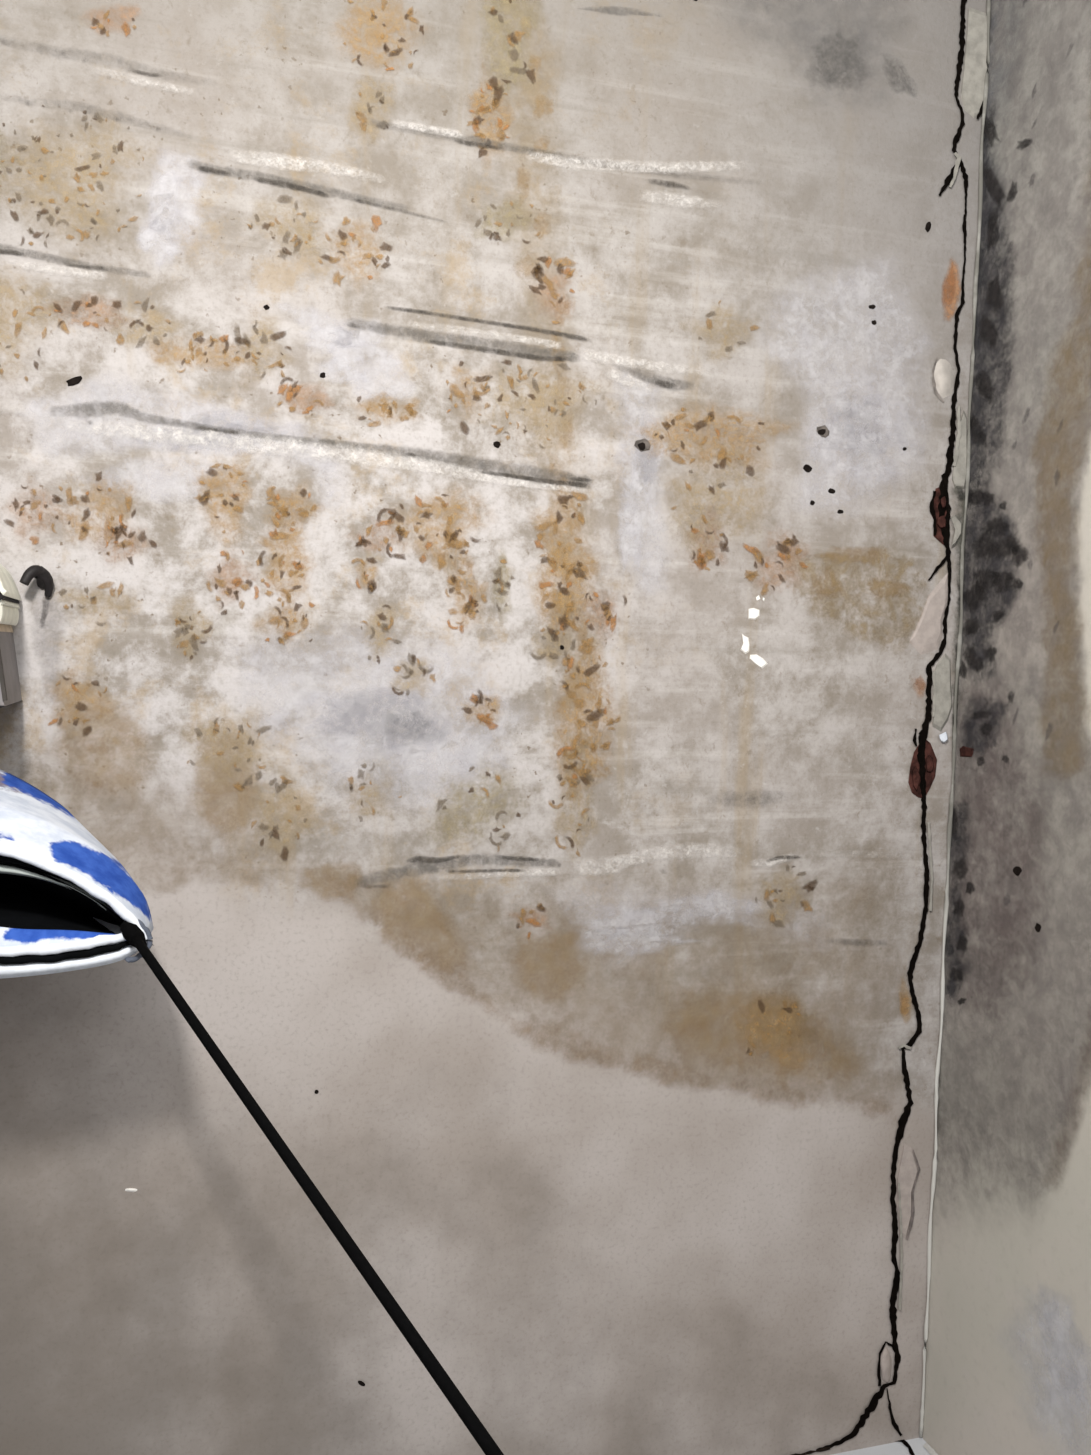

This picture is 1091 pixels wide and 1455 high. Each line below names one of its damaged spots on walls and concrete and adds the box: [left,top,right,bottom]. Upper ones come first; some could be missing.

corrosion [0,110,144,245]
corrosion [248,196,391,285]
corrosion [0,280,324,413]
corrosion [446,354,597,447]
corrosion [5,472,157,563]
corrosion [175,486,316,659]
corrosion [352,494,514,631]
corrosion [652,407,808,595]
damp [937,0,1091,1169]
damp [251,643,504,795]
corrosion [532,490,627,856]
crack [791,0,968,1455]